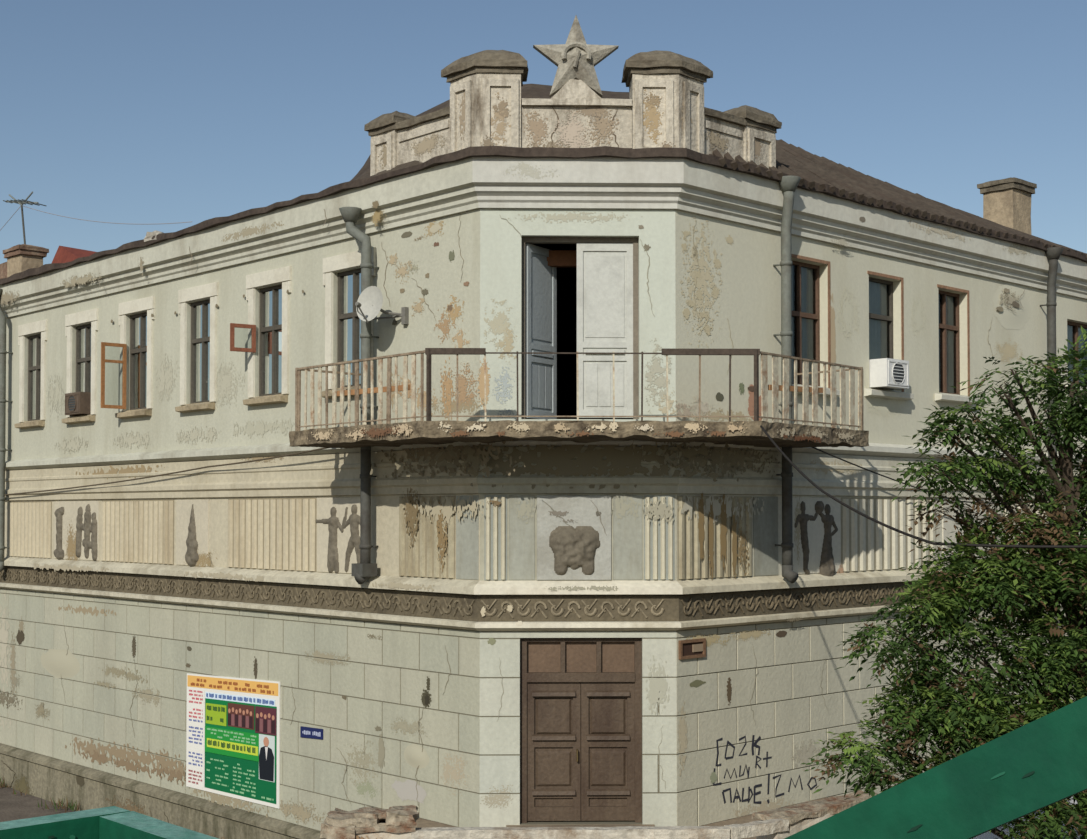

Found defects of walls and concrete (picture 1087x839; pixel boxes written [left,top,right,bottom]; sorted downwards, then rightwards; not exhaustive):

peeling [547,108,596,148]
peeling [643,89,664,144]
peeling [401,219,455,261]
peeling [389,253,429,316]
crack [640,239,654,315]
peeling [680,215,734,347]
corrosion [392,358,491,437]